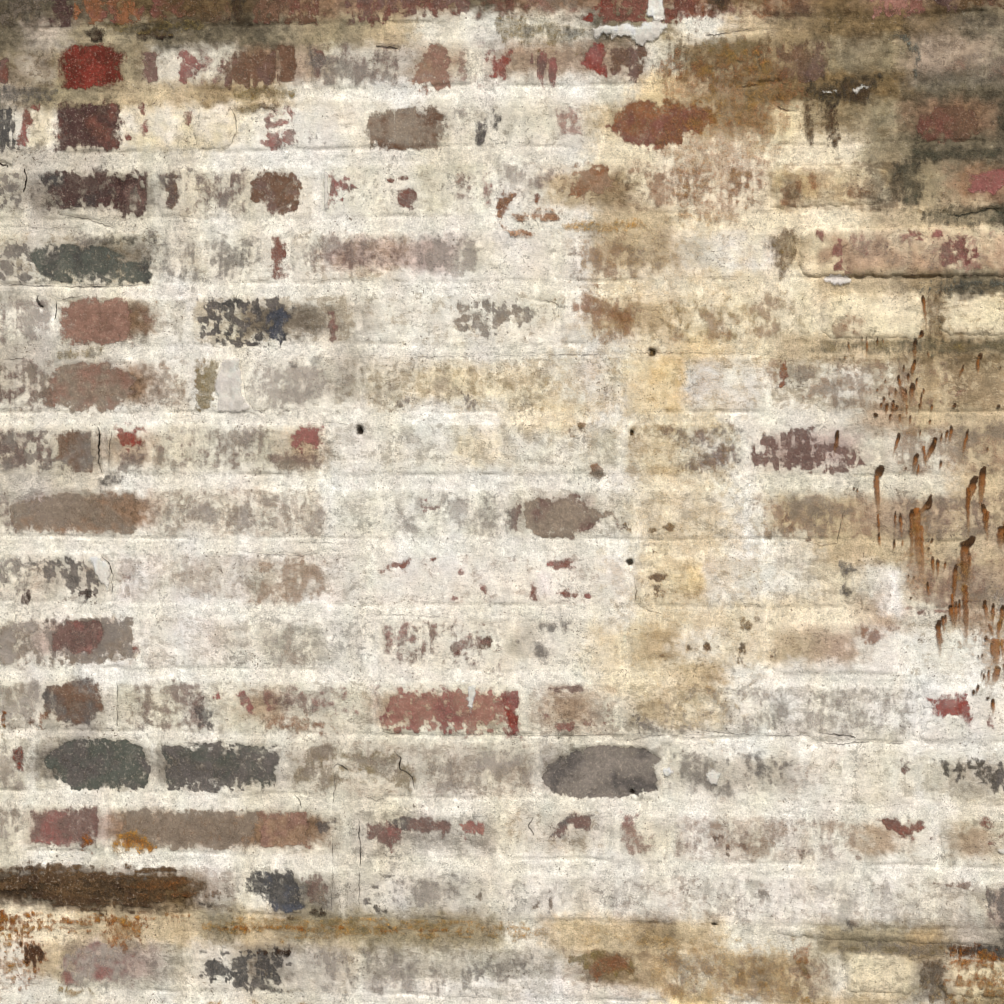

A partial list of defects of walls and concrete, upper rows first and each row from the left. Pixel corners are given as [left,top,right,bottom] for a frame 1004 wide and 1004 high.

damp [84,19,202,42]
damp [495,0,883,200]
damp [893,146,1004,230]
damp [824,274,851,285]
rust [874,465,884,501]
rust [893,494,976,643]
peeling [0,616,138,667]
rust [972,600,1004,709]
spalling [44,738,151,792]
spalling [161,741,279,793]
spalling [542,745,661,799]
rust [0,861,221,991]